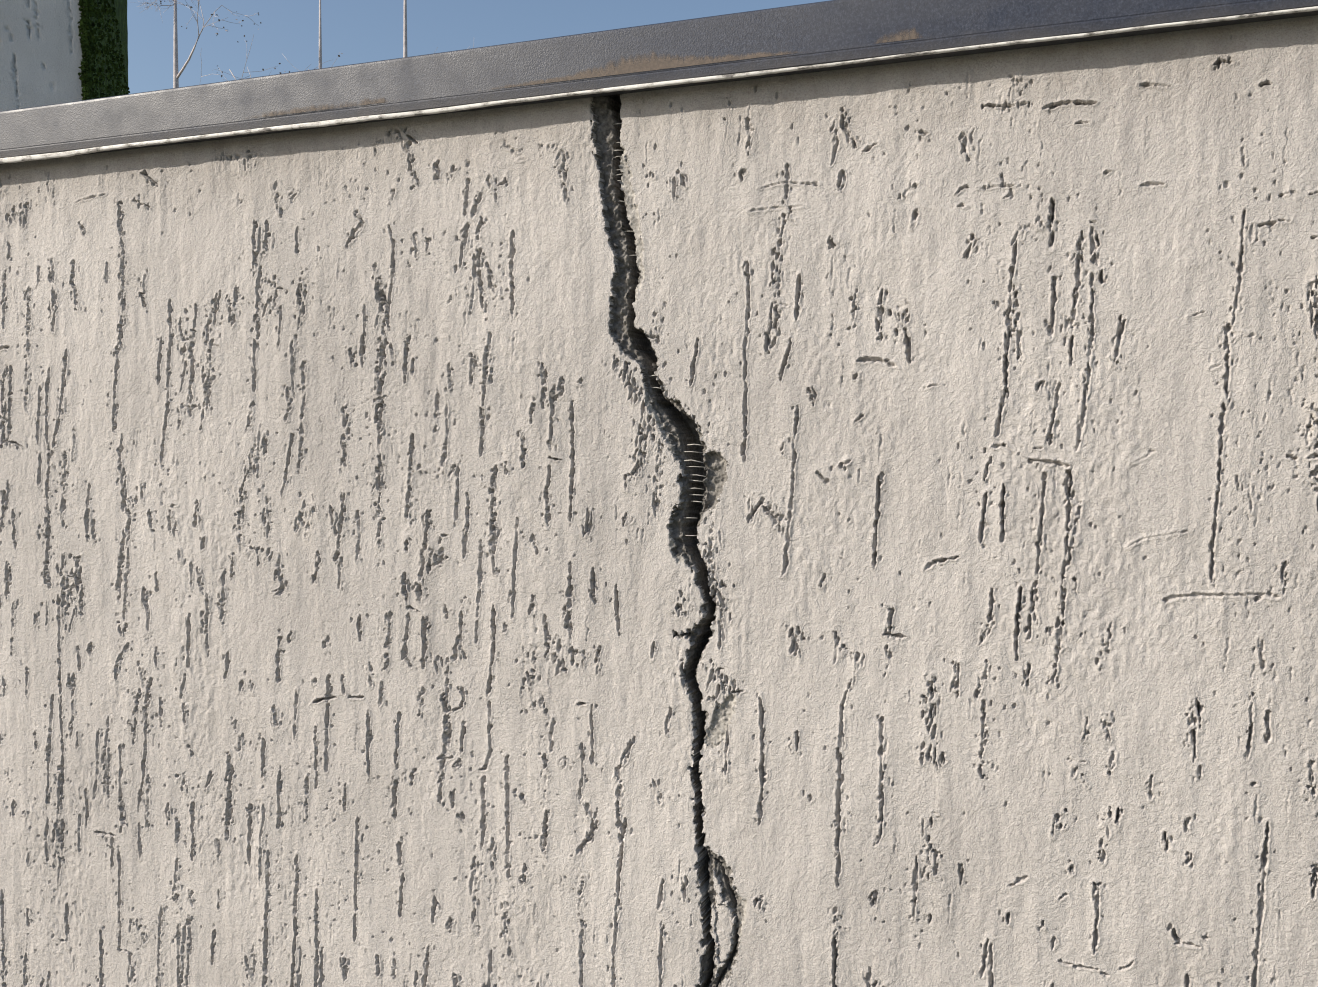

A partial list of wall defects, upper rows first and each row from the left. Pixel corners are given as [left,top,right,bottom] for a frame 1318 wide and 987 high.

crack [590,94,747,987]